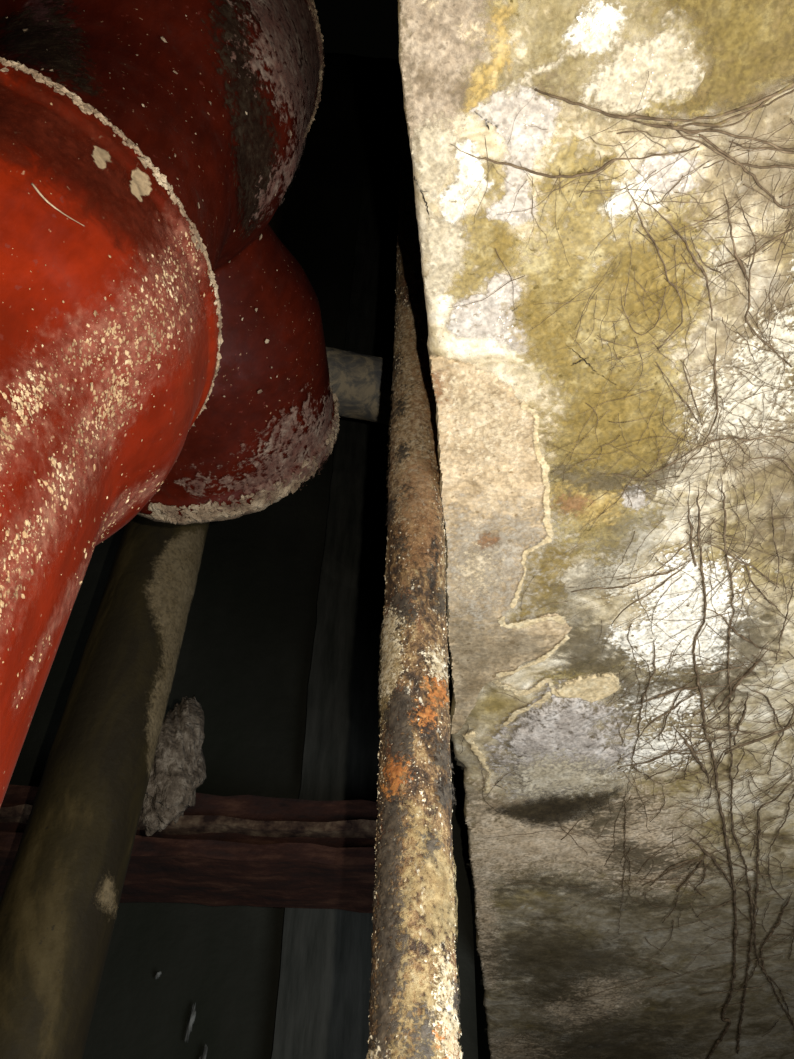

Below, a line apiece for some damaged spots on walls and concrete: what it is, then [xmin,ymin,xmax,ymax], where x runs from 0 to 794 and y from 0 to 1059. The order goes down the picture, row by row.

water stain [411,0,705,296]
water stain [447,273,528,353]
rust [431,372,448,403]
water stain [553,301,794,528]
peeling [430,347,644,828]
rust [409,673,449,733]
rust [380,754,413,802]
water stain [466,532,789,1059]
rust [432,1023,461,1059]